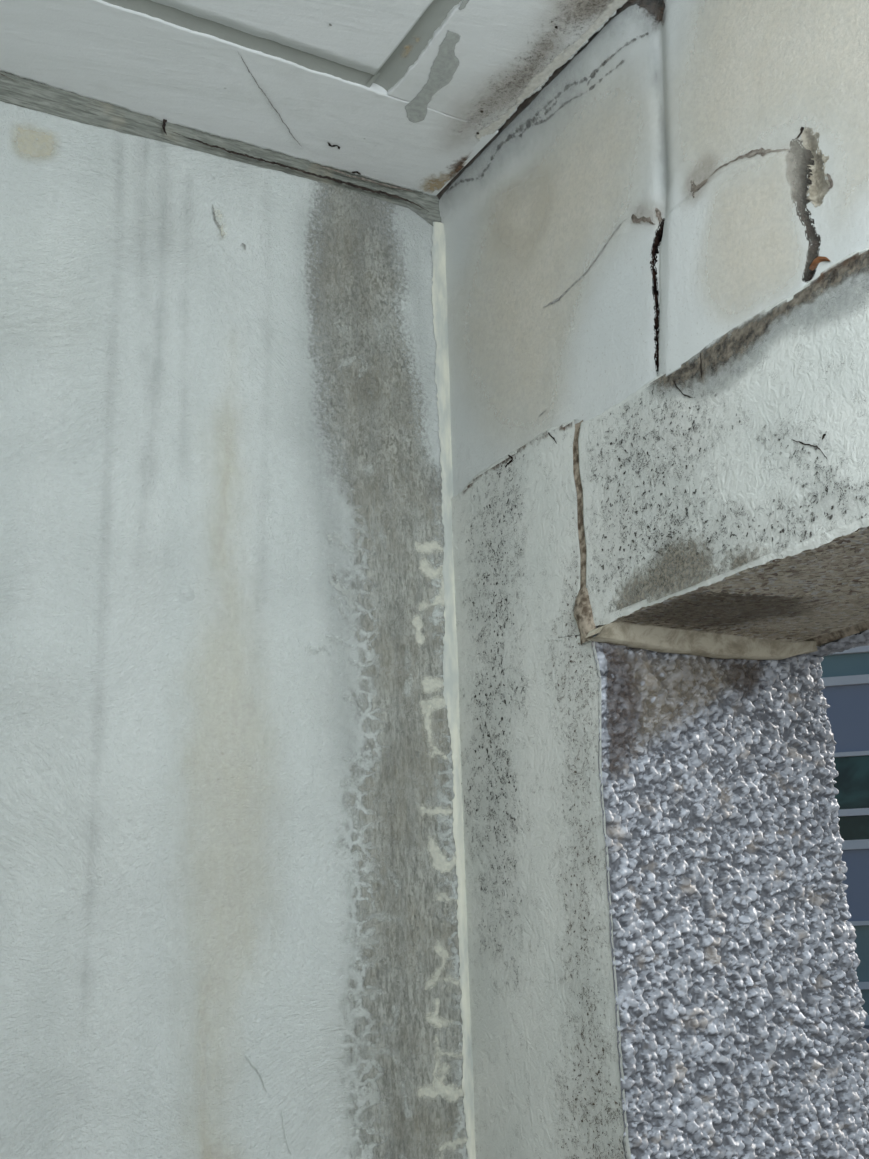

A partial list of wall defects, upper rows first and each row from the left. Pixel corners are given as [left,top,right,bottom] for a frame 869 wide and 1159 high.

peeling [405,31,460,122]
crack [543,208,702,398]
crack [709,138,821,283]
leakage [815,250,869,282]
leakage [307,183,528,1159]
leakage [549,363,869,1159]